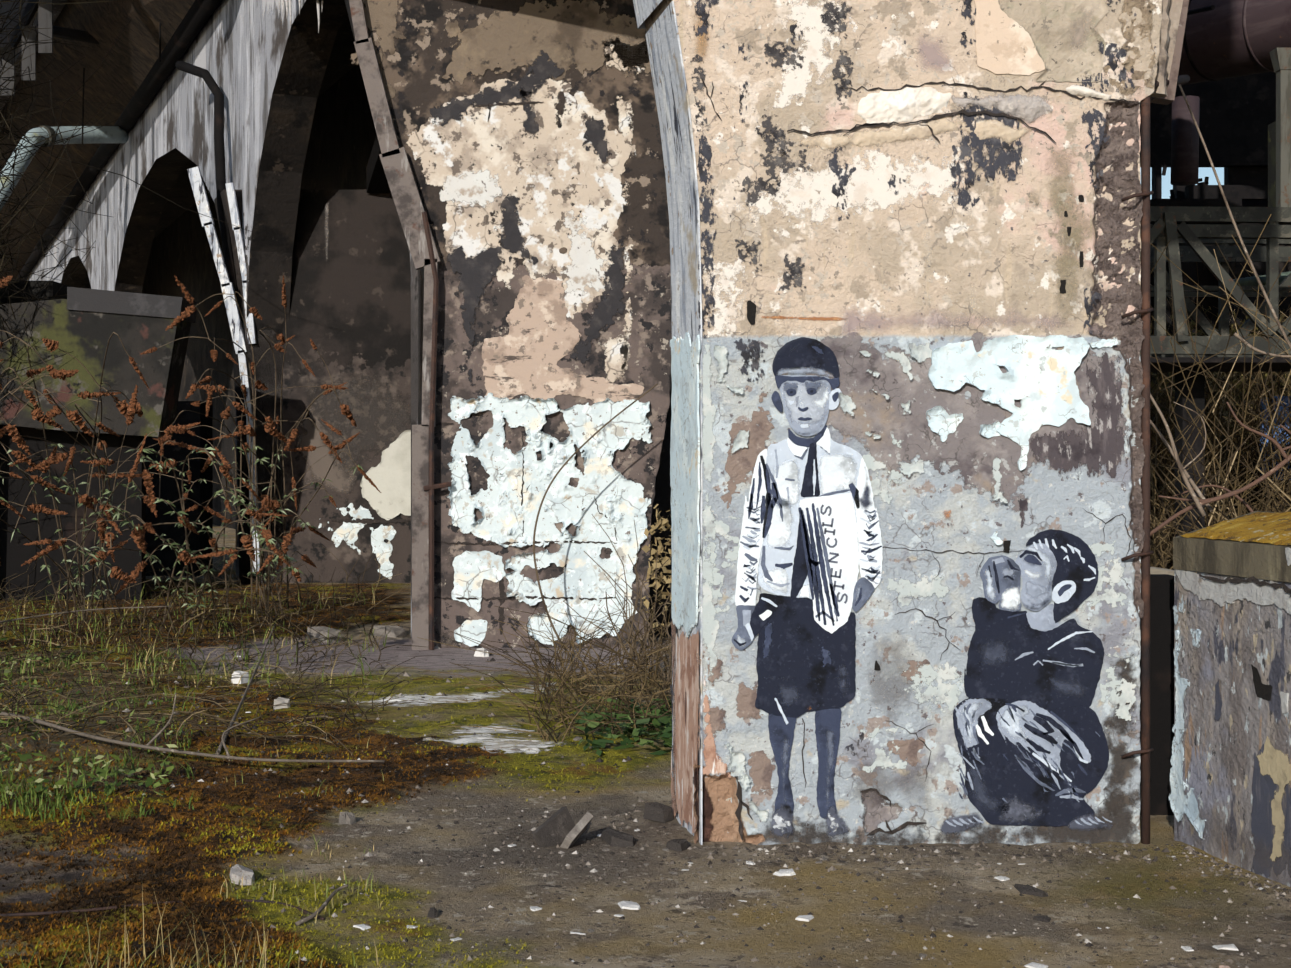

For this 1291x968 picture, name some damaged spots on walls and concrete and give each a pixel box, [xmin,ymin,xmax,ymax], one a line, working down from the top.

peeling [738,22,806,72]
peeling [739,82,856,221]
water stain [772,0,857,108]
water stain [736,150,965,225]
crack [787,77,1148,143]
flaking render [406,0,652,647]
water stain [703,255,745,337]
peeling [804,0,1156,618]
peeling [297,407,411,579]
peeling [670,54,776,845]
peeling [1169,601,1207,839]
peeling [1257,736,1291,862]